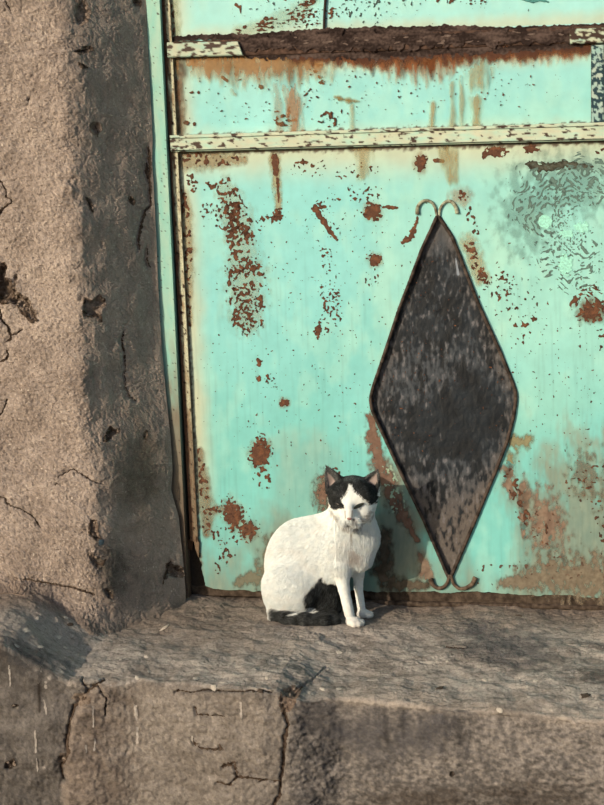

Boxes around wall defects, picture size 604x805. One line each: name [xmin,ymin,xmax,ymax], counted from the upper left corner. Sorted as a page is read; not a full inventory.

corrosion [170,0,604,133]
crack [0,180,12,214]
corrosion [173,152,326,417]
corrosion [413,143,604,359]
crack [0,310,22,362]
crack [0,496,40,527]
corrosion [197,448,260,574]
corrosion [247,433,278,489]
corrosion [350,403,420,543]
crack [60,677,107,777]
crack [176,689,274,717]
crack [193,709,290,805]